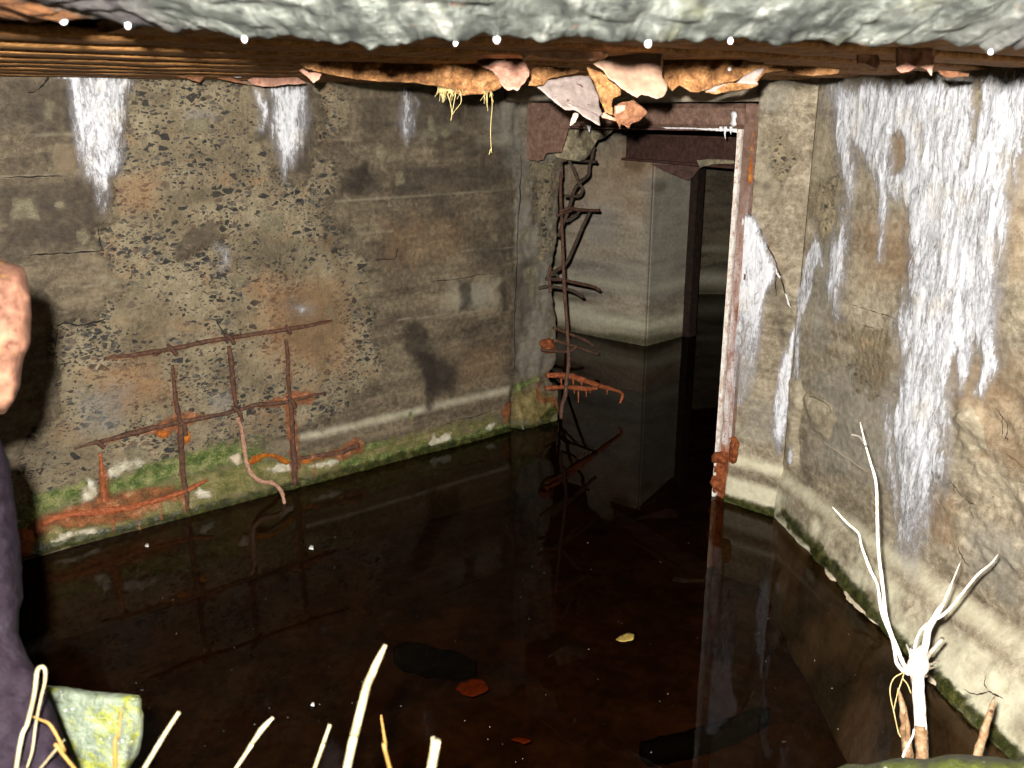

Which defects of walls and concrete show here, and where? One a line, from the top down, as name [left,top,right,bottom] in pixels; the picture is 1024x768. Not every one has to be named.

water stain [58,77,133,211]
water stain [255,84,307,177]
water stain [734,215,775,401]
water stain [773,71,1024,560]
corrosion [139,412,204,443]
corrosion [248,392,363,475]
corrosion [27,469,185,536]
water stain [844,591,877,624]